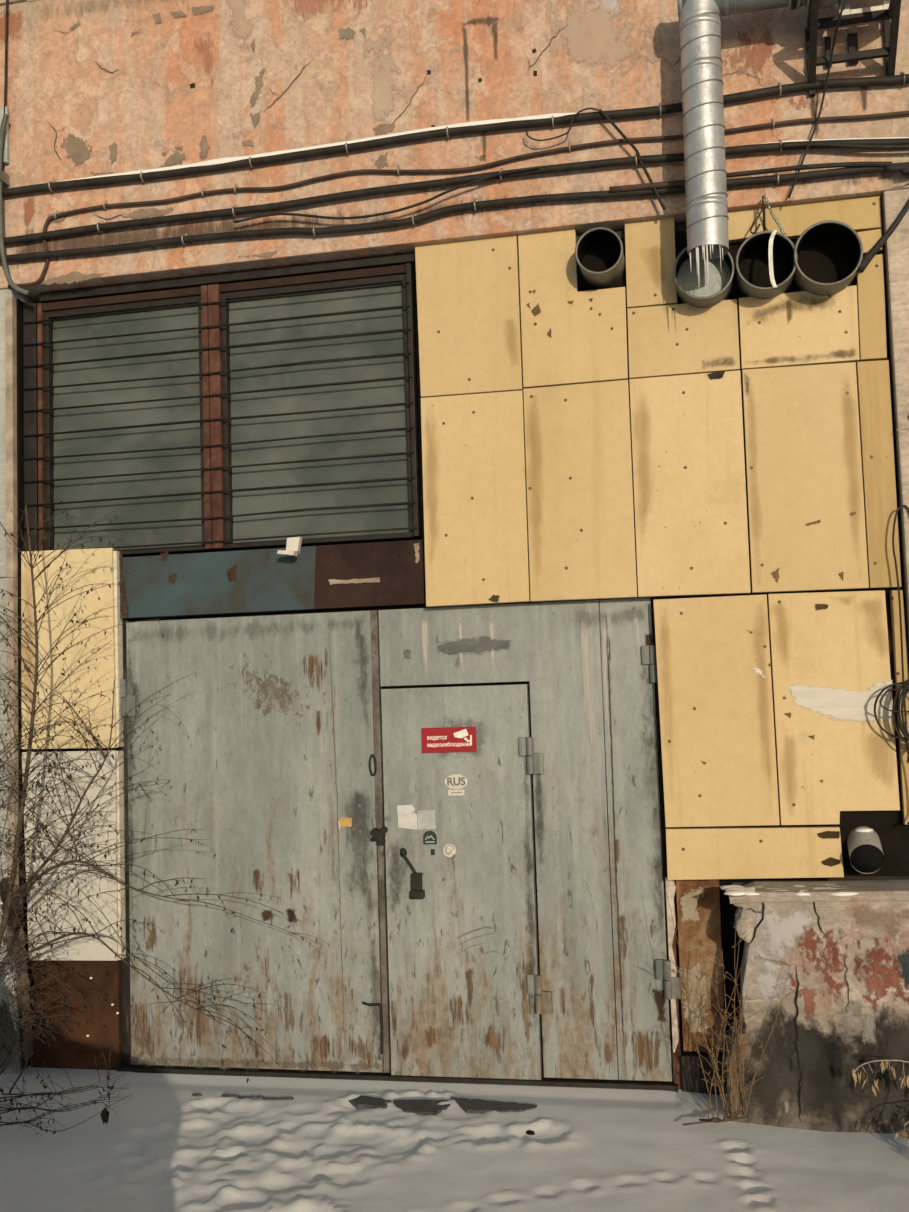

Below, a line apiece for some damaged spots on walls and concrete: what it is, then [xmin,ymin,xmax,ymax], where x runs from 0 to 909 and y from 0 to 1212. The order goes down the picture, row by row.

flaking render [242,66,267,147]
flaking render [61,133,117,176]
flaking render [159,135,209,168]
flaking render [127,207,175,219]
corrosion [144,916,156,949]
corrosion [286,870,300,922]
corrosion [311,1035,377,1066]
corrosion [389,968,474,1060]
corrosion [516,959,534,1044]
crack [789,968,802,1120]
damp [725,1007,909,1133]
peeling [749,906,909,1019]